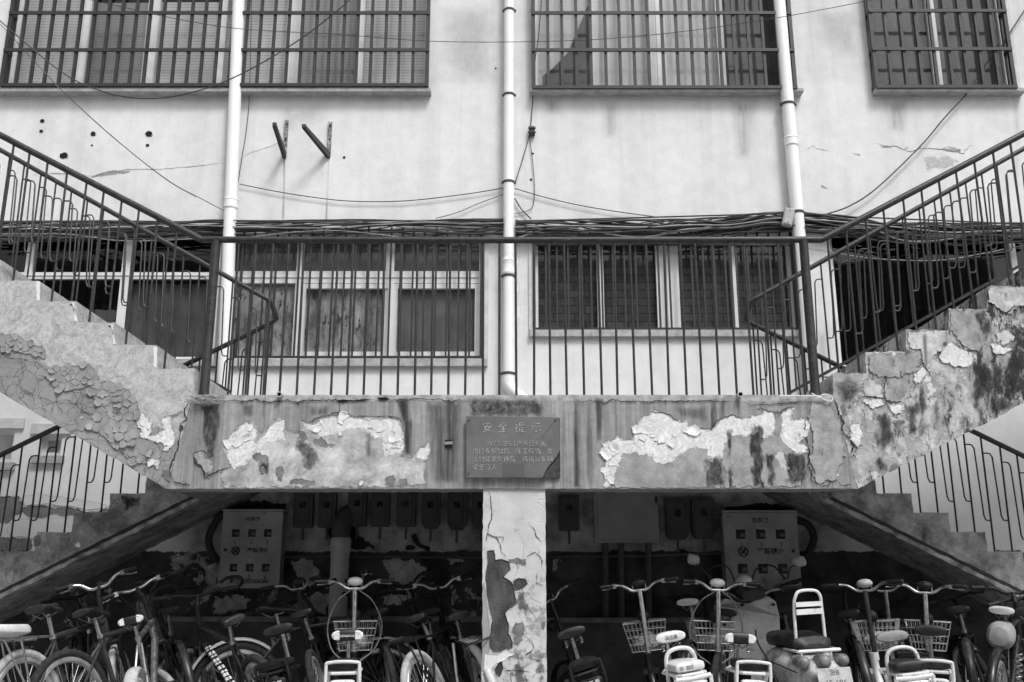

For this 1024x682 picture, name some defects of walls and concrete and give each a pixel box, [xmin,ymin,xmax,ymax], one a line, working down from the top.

peeling [136,409,184,481]
water stain [203,405,219,457]
peeling [194,397,431,488]
water stain [706,458,732,486]
peeling [599,401,864,488]
water stain [750,426,806,488]
water stain [875,413,894,470]
water stain [906,389,939,434]
peeling [863,287,1024,414]
mould [974,349,1021,420]
crack [486,493,543,585]
spalling [482,550,528,682]